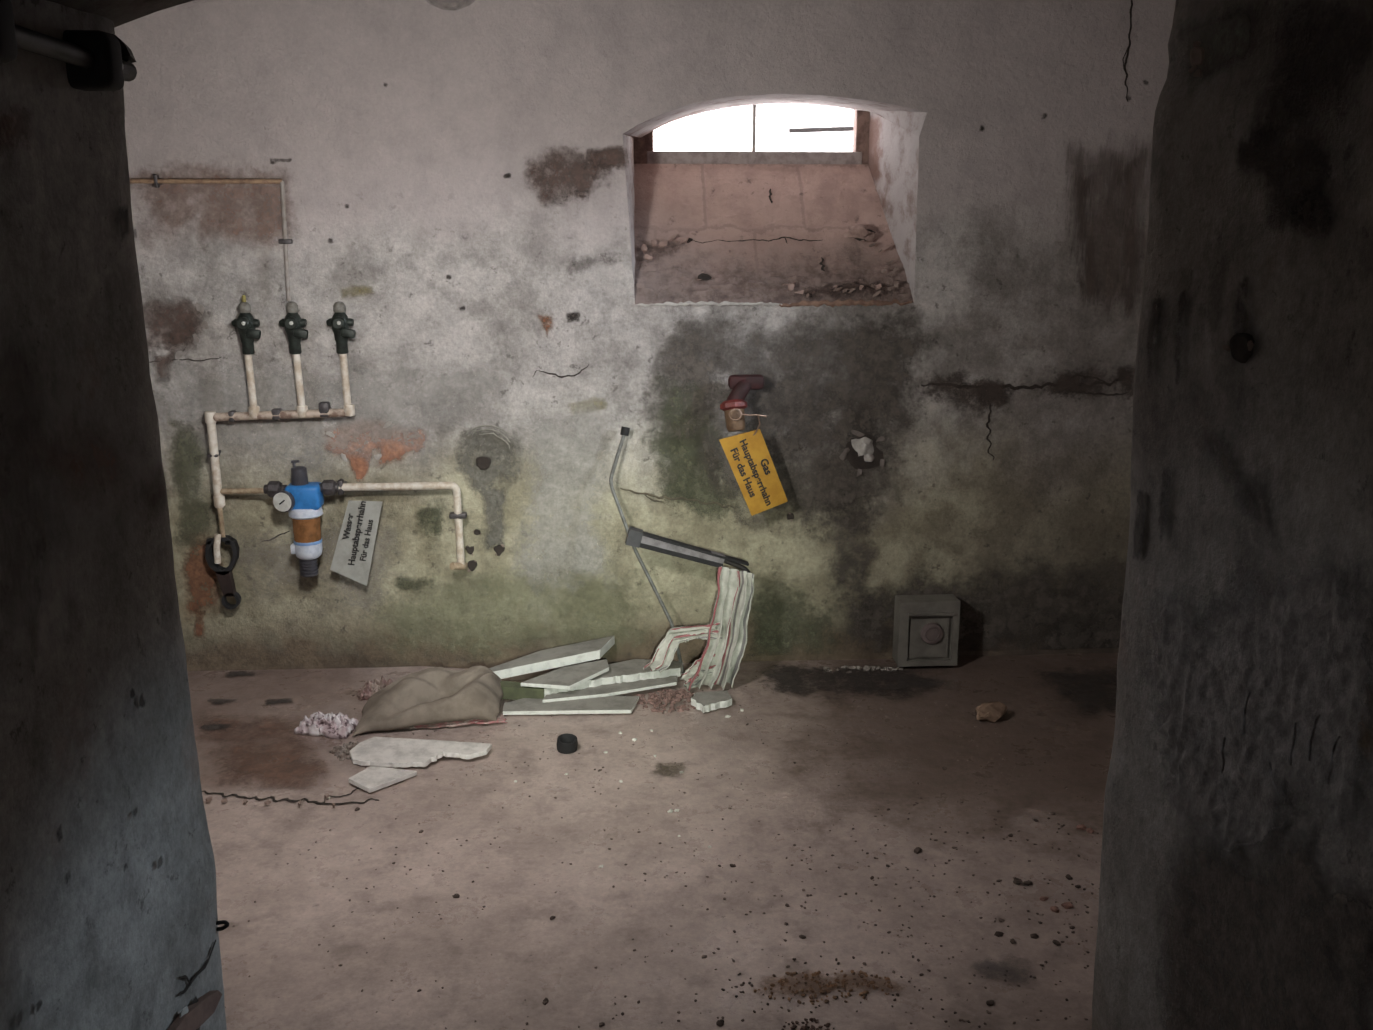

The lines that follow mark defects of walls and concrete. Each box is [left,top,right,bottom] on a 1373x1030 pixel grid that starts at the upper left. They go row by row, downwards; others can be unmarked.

crack [1122,0,1133,102]
damp [1038,292,1186,396]
spalling [839,430,885,477]
damp [645,312,1170,651]
crack [921,374,1127,460]
damp [763,665,943,699]
crack [202,787,379,808]
spalling [168,990,222,1030]